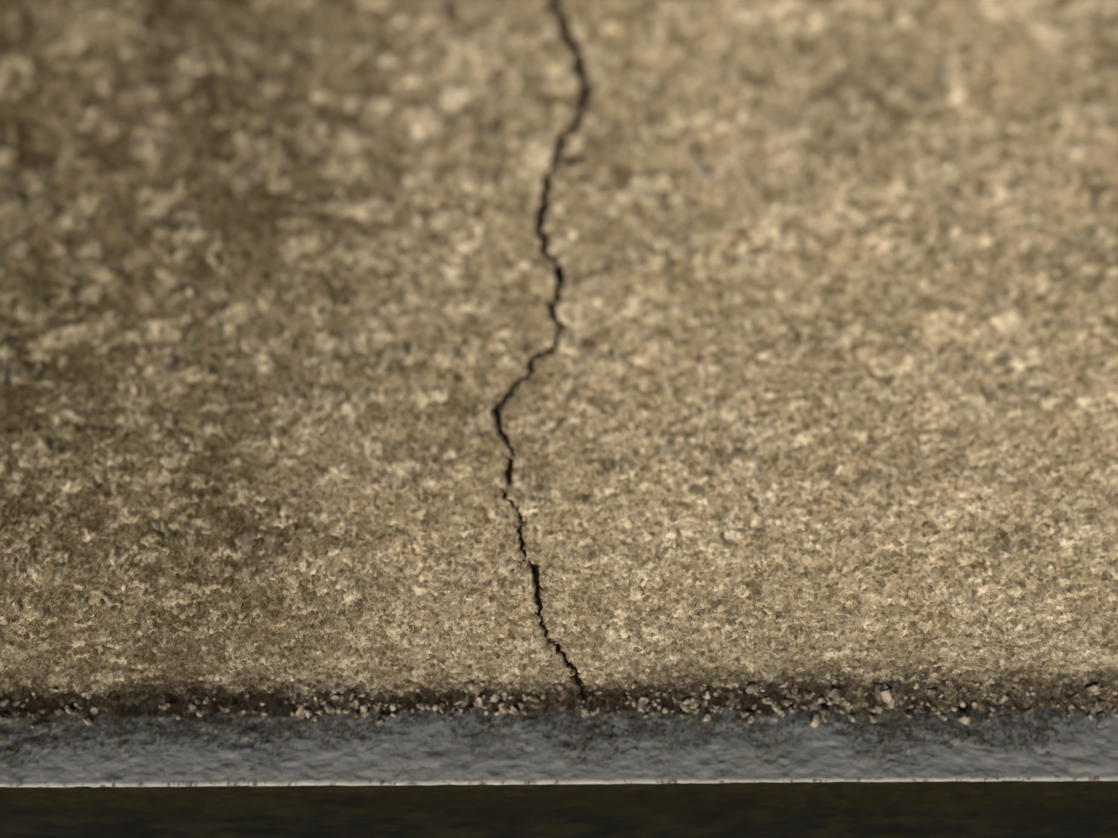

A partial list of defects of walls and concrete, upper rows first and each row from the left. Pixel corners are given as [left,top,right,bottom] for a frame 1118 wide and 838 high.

crack [478,0,594,697]